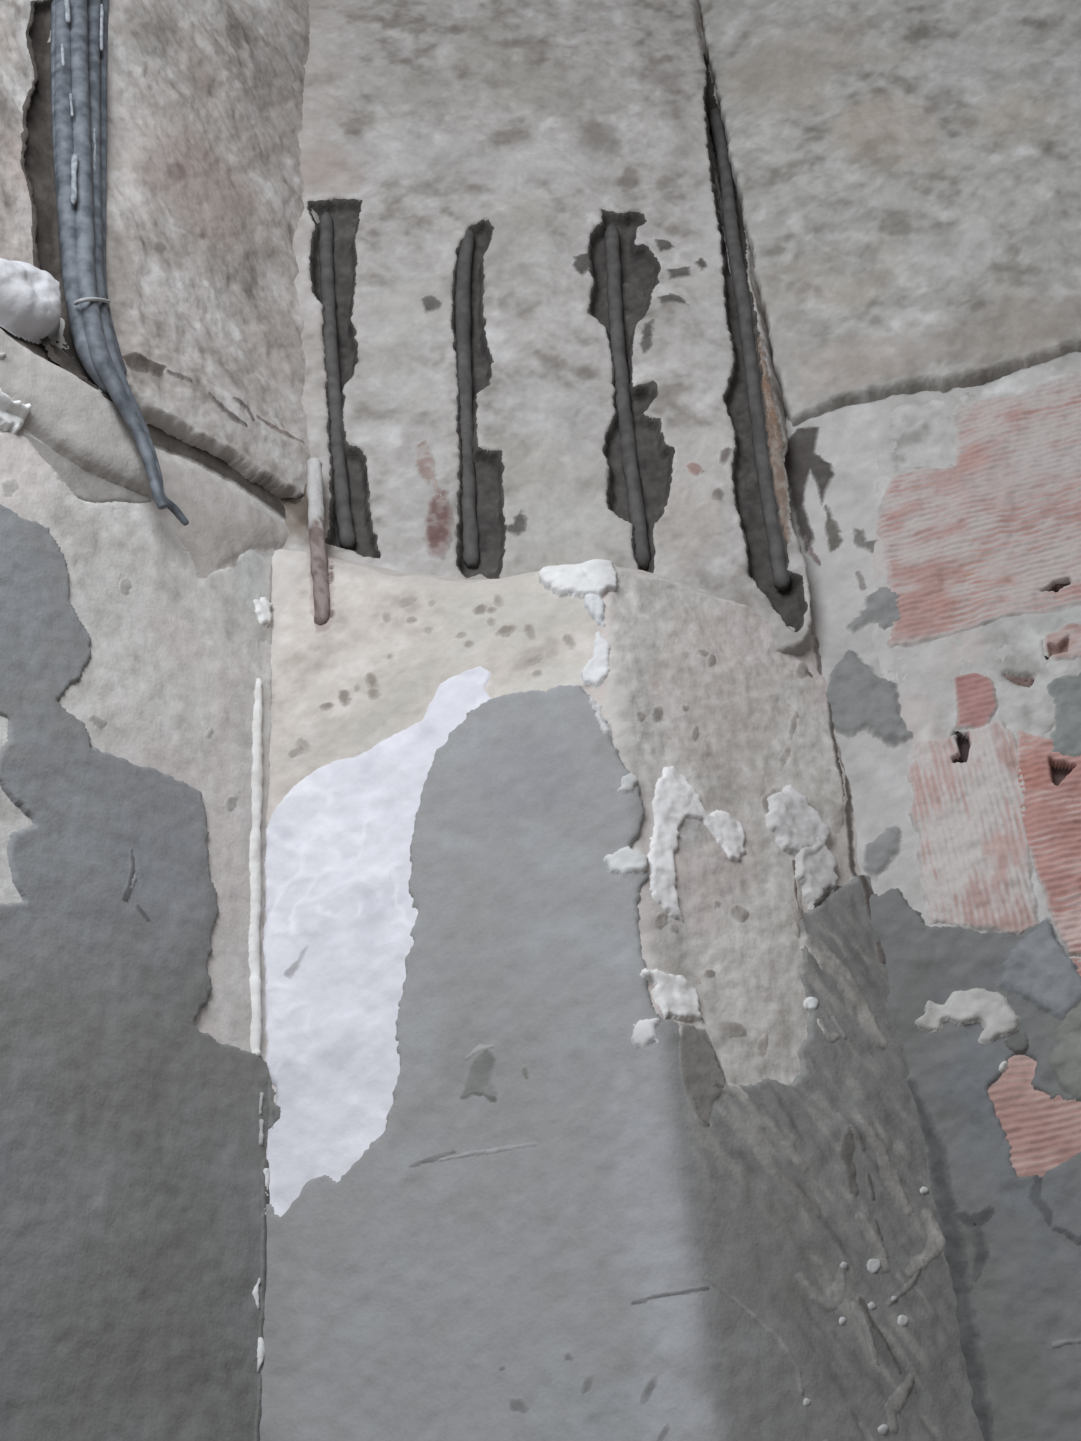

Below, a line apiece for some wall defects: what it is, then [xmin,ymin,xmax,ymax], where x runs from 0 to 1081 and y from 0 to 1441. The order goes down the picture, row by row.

rust [280,483,309,531]
rust [305,552,339,634]
peeling [0,0,848,1086]
flaking render [872,365,1081,976]
spalling [459,1044,499,1103]
flaking render [987,1054,1081,1177]